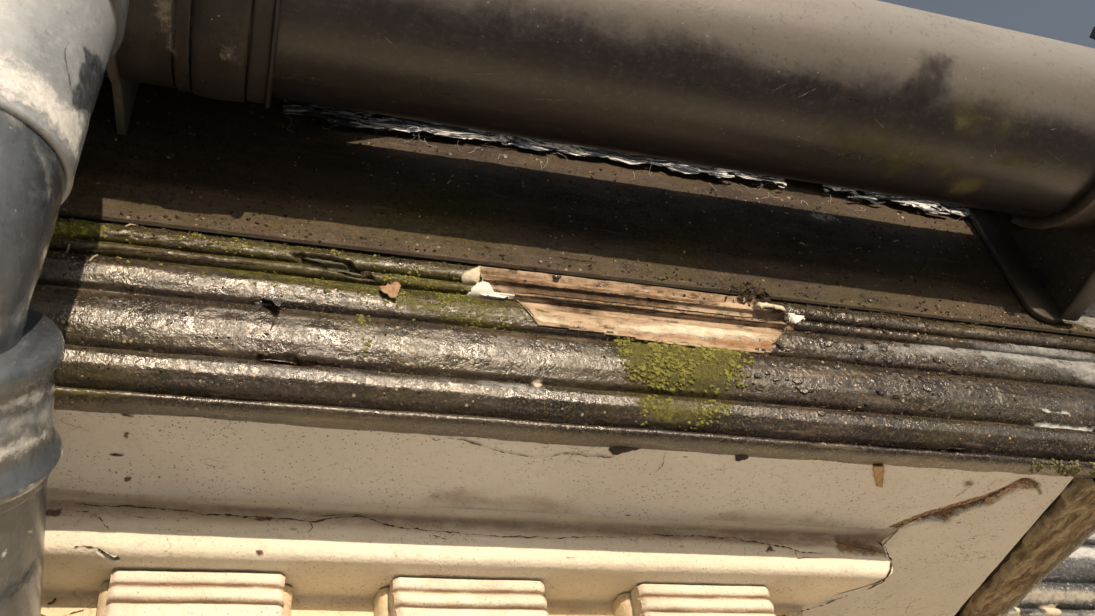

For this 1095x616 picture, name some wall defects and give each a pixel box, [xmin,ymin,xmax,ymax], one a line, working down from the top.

peeling [462,266,829,416]
peeling [821,319,918,368]
crack [890,478,1042,529]
crack [57,501,822,559]
crack [776,569,891,616]